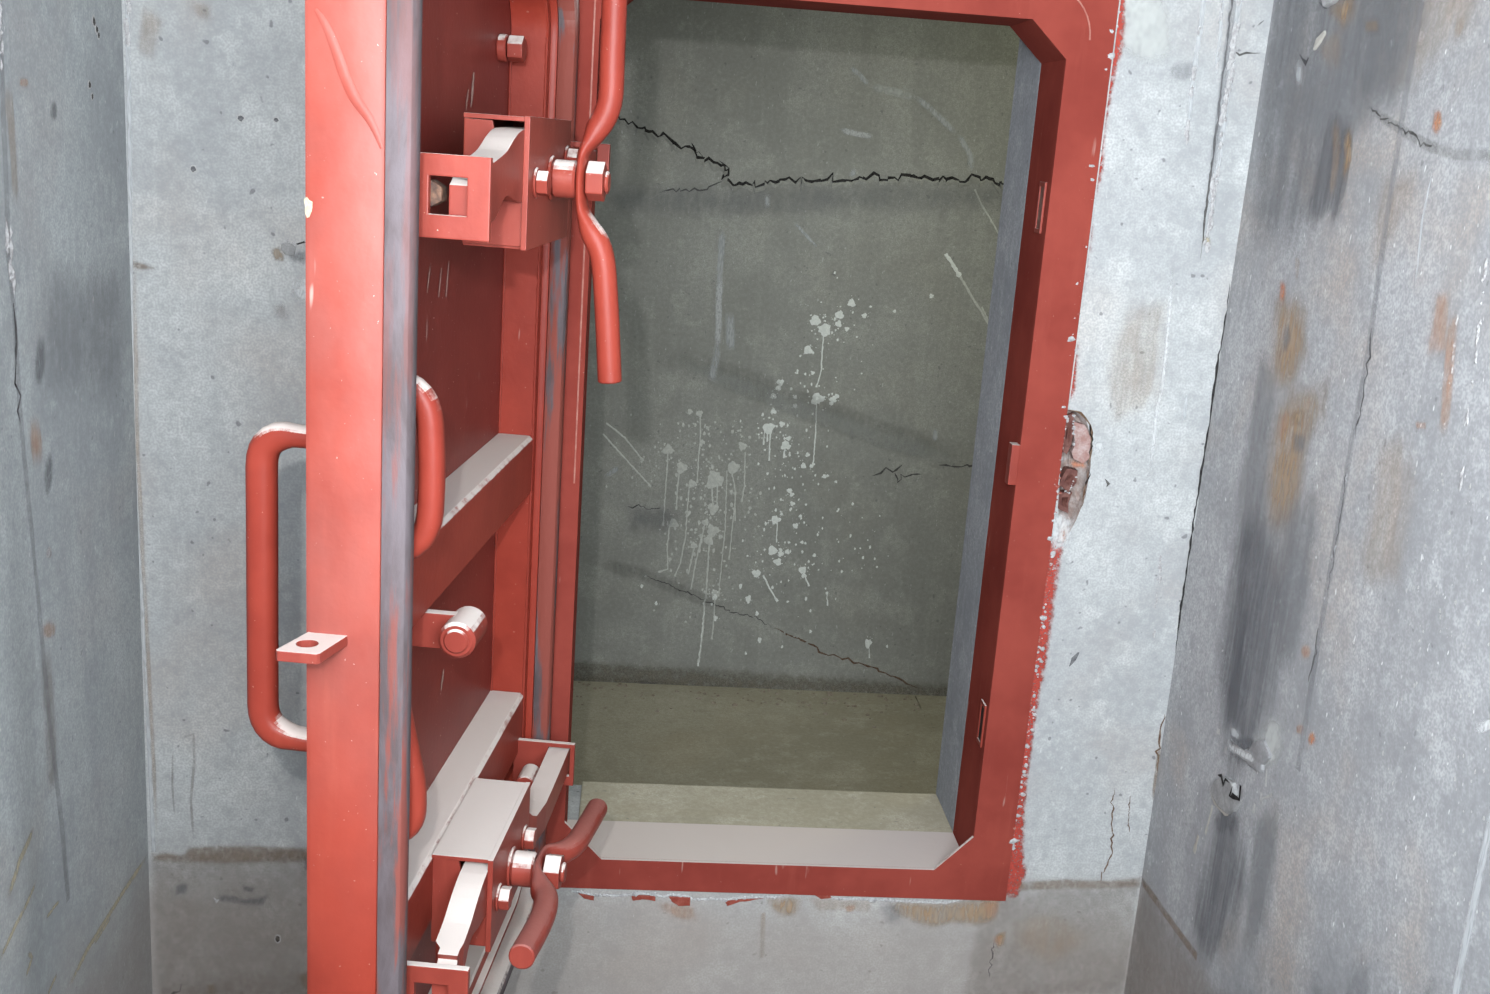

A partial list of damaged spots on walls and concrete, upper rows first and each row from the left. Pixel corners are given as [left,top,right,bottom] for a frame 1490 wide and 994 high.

flaking render [1105,0,1166,81]
crack [616,117,1004,195]
damp [1281,126,1351,221]
crack [1368,107,1435,148]
damp [711,236,734,377]
damp [1440,251,1488,451]
spalling [1009,395,1102,850]
spalling [1210,774,1244,826]